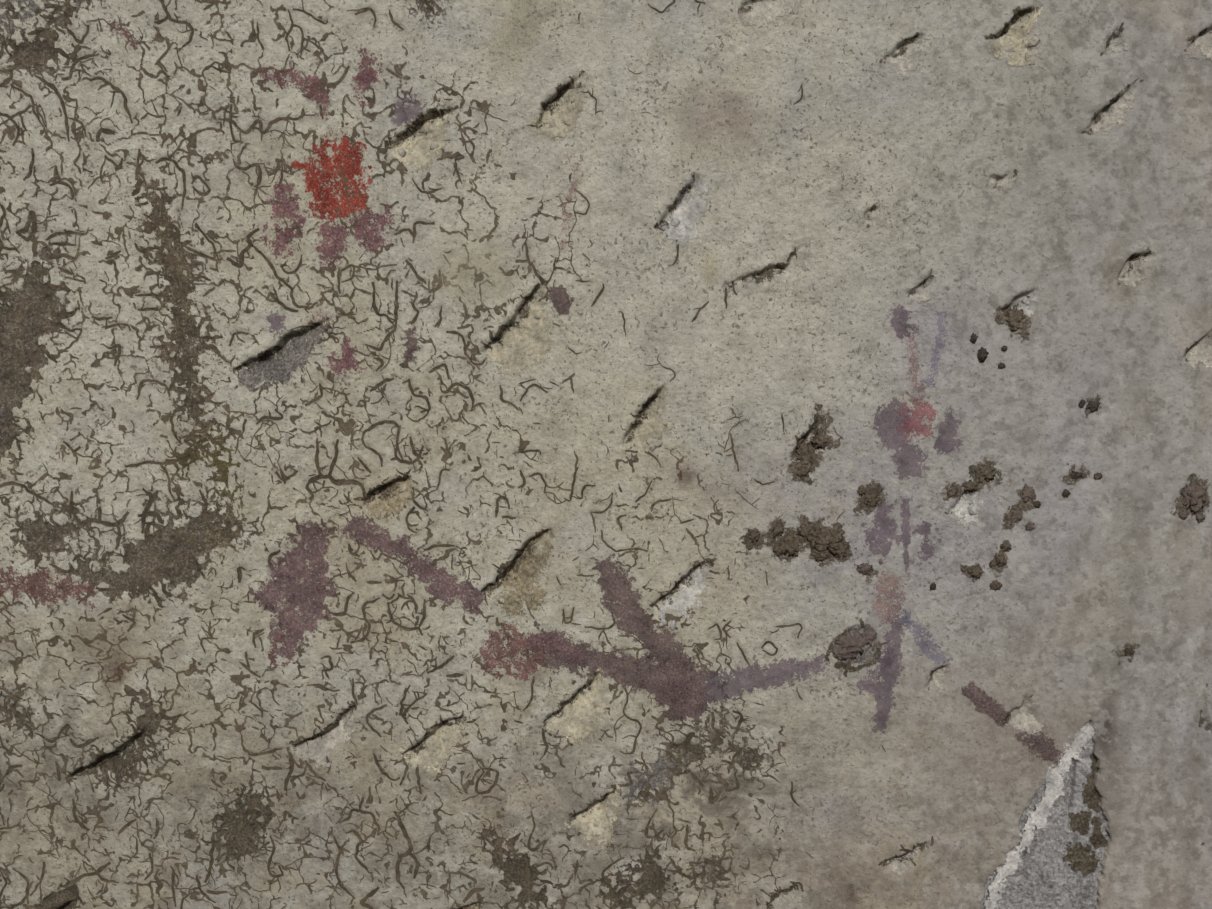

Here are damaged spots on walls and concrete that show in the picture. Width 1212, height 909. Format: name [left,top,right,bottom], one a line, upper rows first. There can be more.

crack [154,0,213,47]
crack [256,7,404,52]
spalling [984,0,1048,67]
spalling [1082,74,1146,145]
crack [0,25,559,551]
spalling [1114,246,1160,288]
spalling [1183,336,1212,372]
crack [495,443,694,552]
crack [696,620,803,666]
crack [251,543,463,909]
crack [0,705,227,909]
spalling [981,722,1108,909]